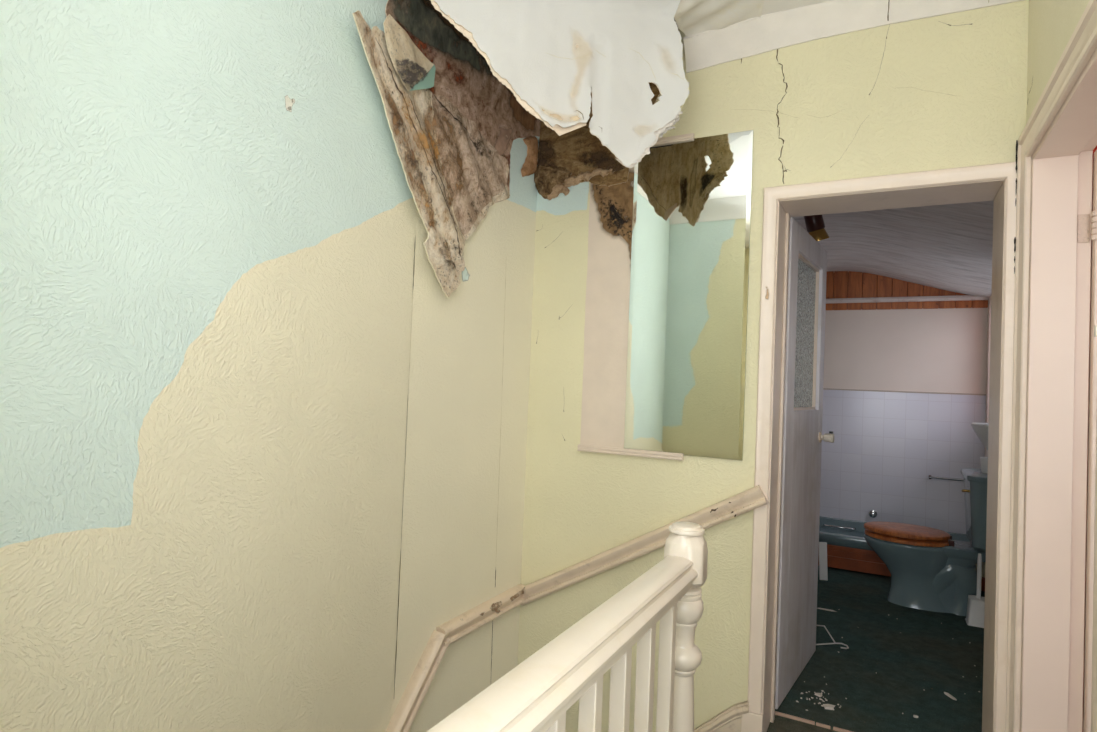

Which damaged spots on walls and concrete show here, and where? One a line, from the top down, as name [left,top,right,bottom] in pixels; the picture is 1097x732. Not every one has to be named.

damp [396,59,428,89]
damp [385,87,492,228]
damp [392,0,497,79]
damp [508,89,557,168]
damp [579,151,634,266]
crack [732,49,844,184]